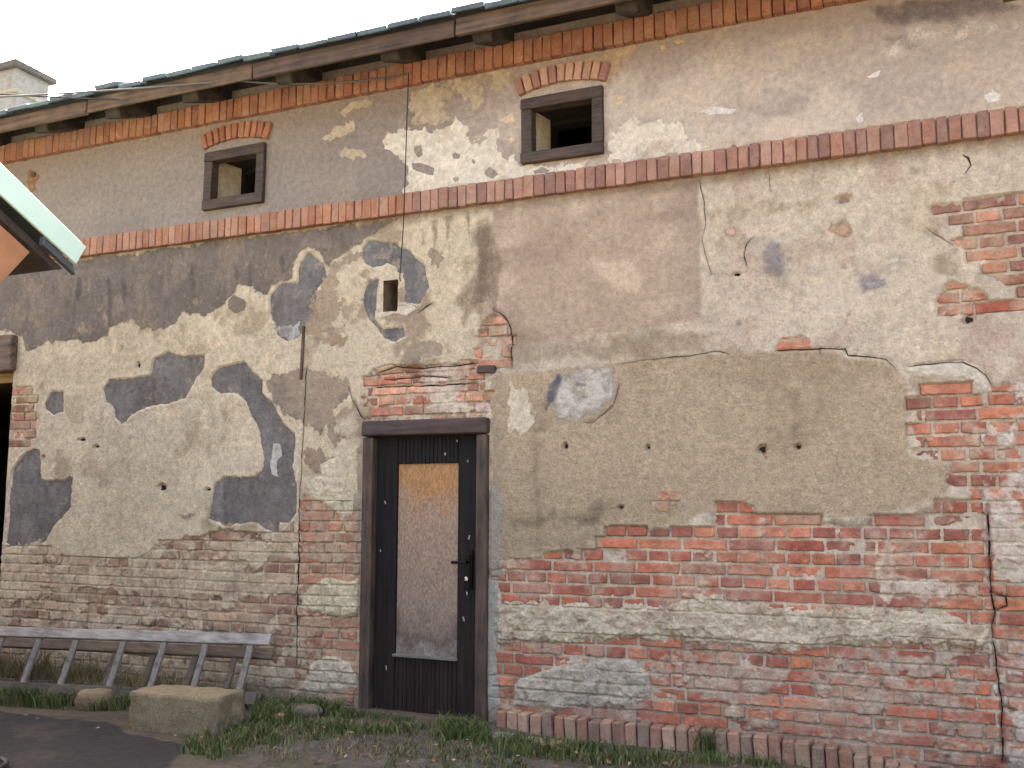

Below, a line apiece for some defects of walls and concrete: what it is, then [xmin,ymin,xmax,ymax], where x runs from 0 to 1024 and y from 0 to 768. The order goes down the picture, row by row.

flaking render [383,69,589,193]
flaking render [270,241,516,423]
crack [774,348,991,383]
flaking render [931,194,1024,323]
flaking render [0,352,360,708]
flaking render [491,381,1024,768]
crack [987,515,1015,761]